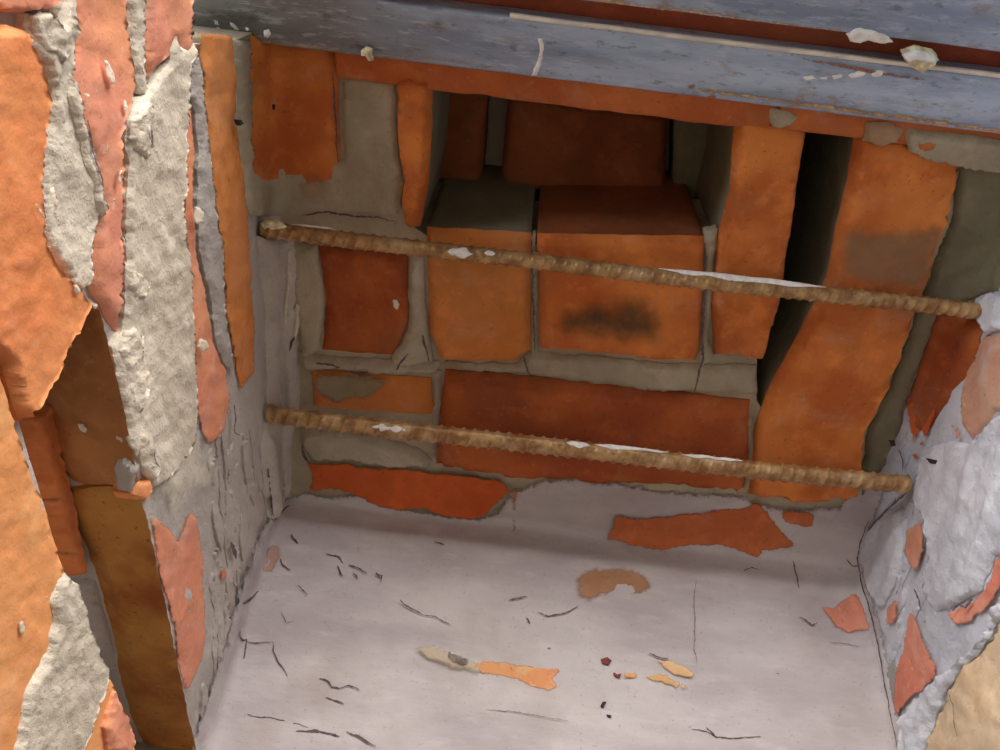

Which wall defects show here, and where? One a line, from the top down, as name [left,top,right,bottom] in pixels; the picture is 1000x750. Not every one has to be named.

peeling [27,11,81,61]
peeling [66,72,110,217]
crack [327,554,383,580]
crack [508,596,578,624]
flaking render [948,557,1000,624]
crack [240,612,290,675]
crack [320,678,359,705]
flaking render [476,661,558,691]
flaking render [894,613,936,713]
flaking render [100,691,136,750]
crack [247,714,375,746]
crack [692,727,761,739]